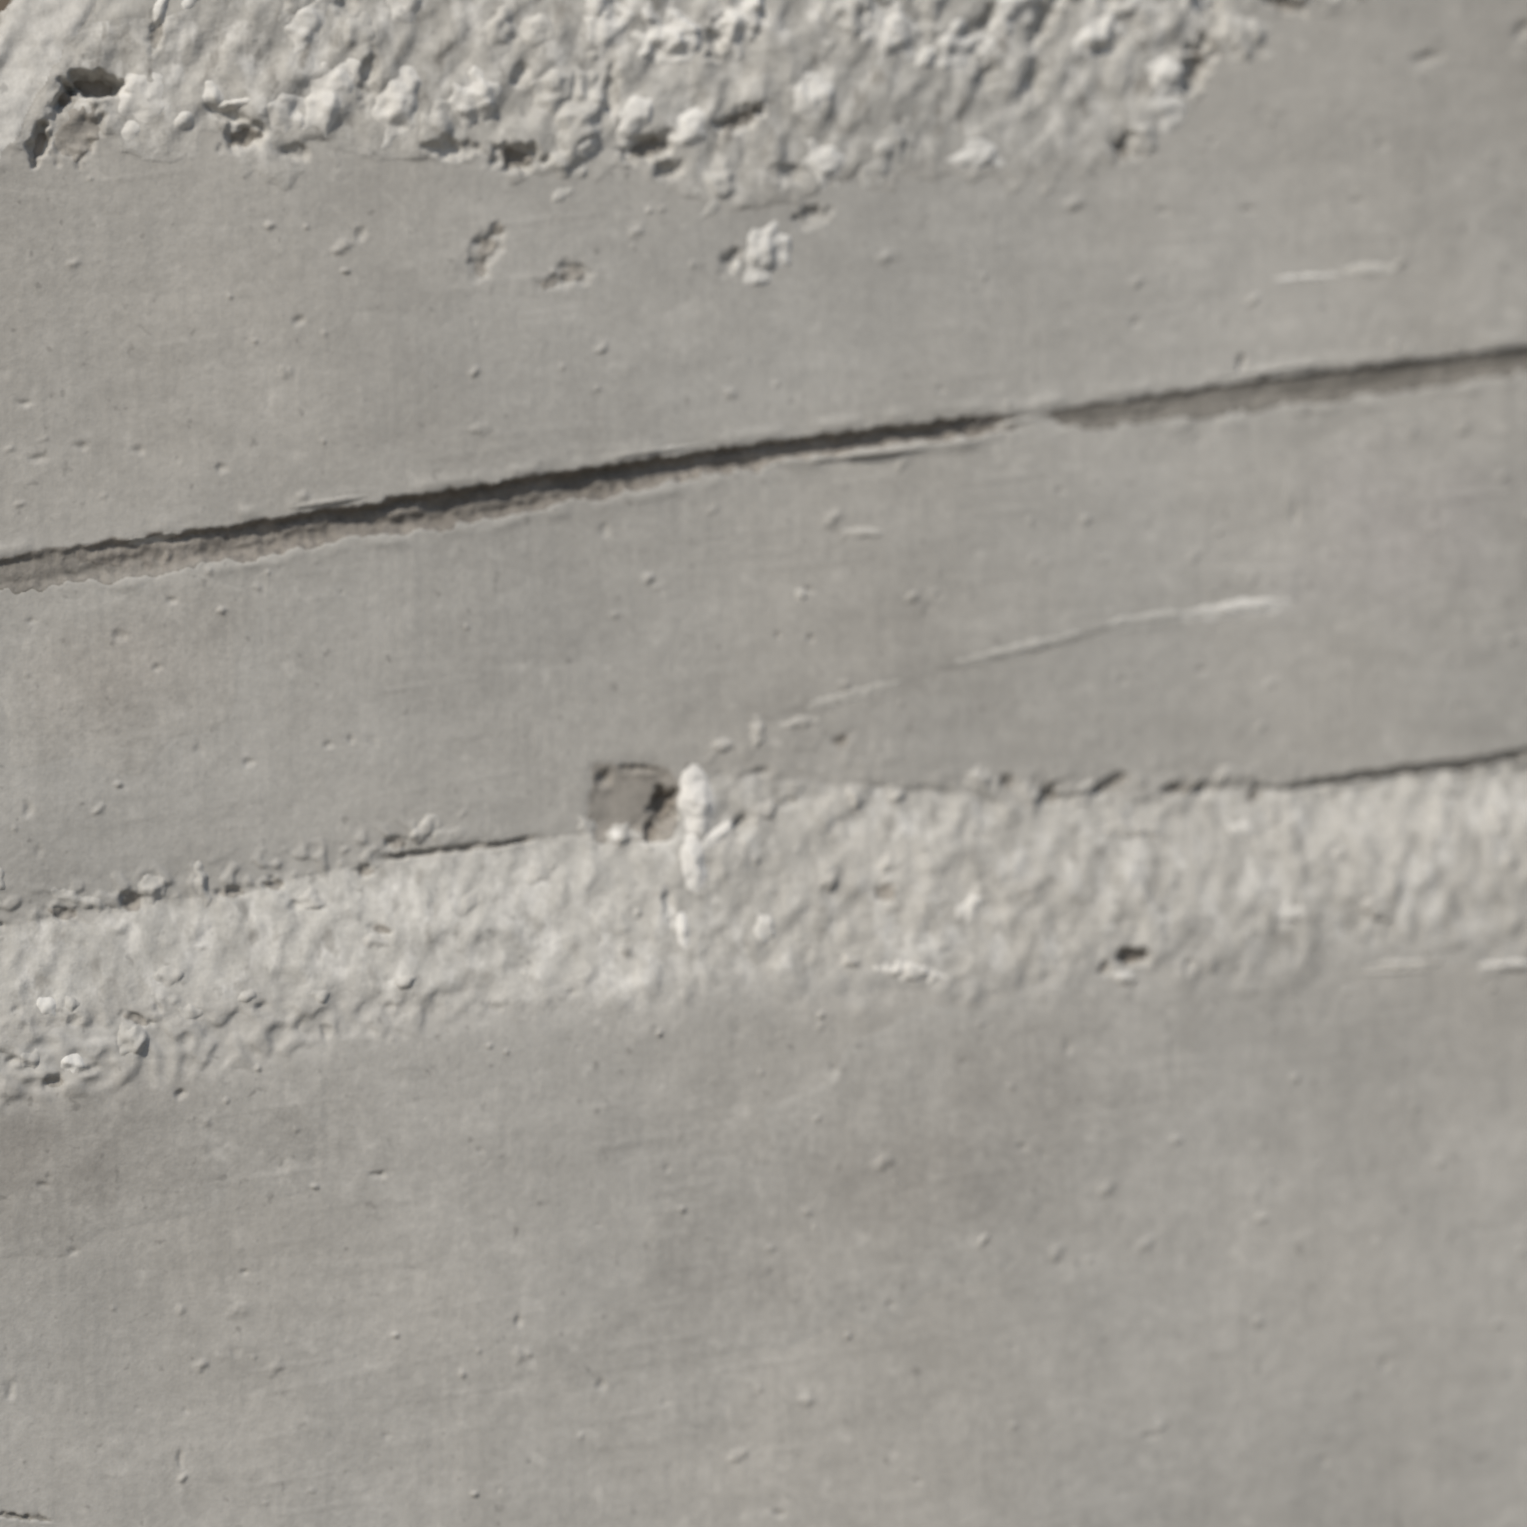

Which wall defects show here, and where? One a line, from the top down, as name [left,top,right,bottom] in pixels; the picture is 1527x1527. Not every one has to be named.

spalling [15,0,1360,290]
crack [0,346,1527,595]
crack [1001,775,1058,805]
crack [1096,774,1199,795]
crack [1245,748,1527,803]
spalling [576,789,674,852]
crack [383,834,537,860]
spalling [48,874,168,920]
spalling [840,951,947,984]
spalling [1097,949,1146,987]
spalling [118,1013,151,1056]
spalling [21,1048,84,1088]